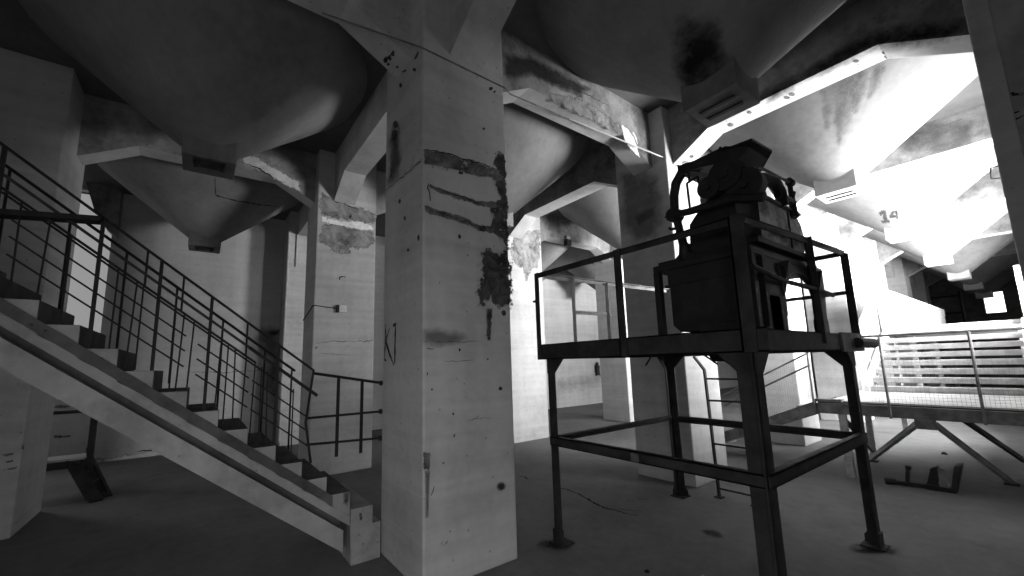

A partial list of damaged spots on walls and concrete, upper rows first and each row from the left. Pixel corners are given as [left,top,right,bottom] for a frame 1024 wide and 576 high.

spalling [243,156,301,191]
spalling [319,192,377,254]
peeling [423,149,541,340]
leakage [427,332,458,343]